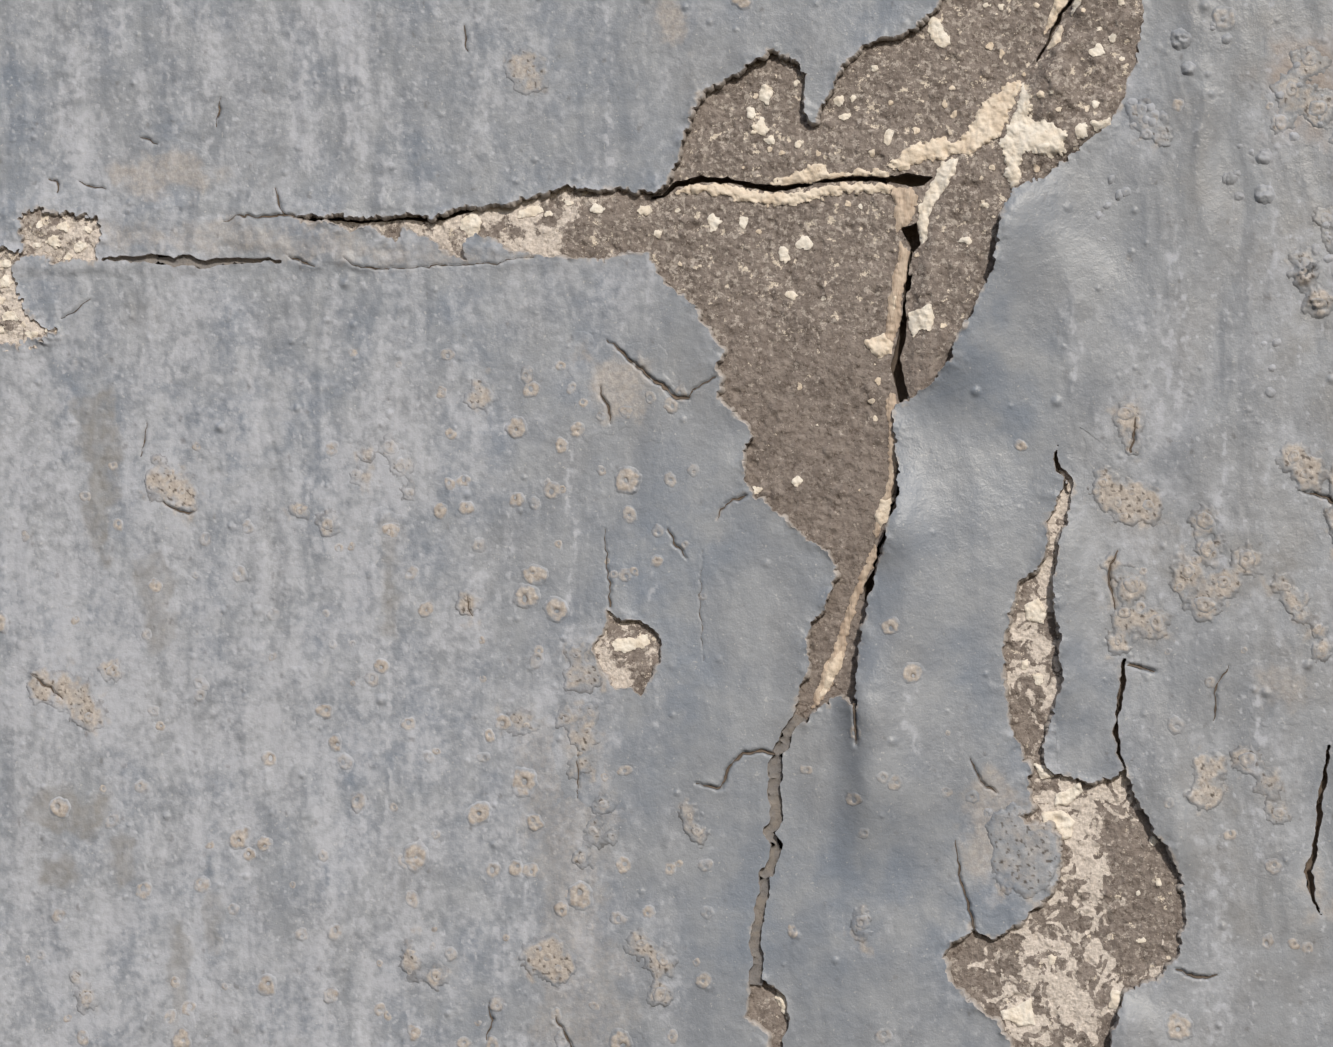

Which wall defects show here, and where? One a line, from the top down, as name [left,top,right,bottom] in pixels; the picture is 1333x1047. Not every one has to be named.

crack [224,188,474,224]
peeling [0,208,110,351]
crack [104,254,315,269]
crack [346,257,534,270]
crack [600,387,611,420]
crack [607,340,716,399]
peeling [300,0,1144,723]
crack [655,0,1081,986]
crack [1108,550,1118,610]
peeling [945,469,1186,1047]
crack [1113,659,1155,767]
crack [1304,746,1330,912]